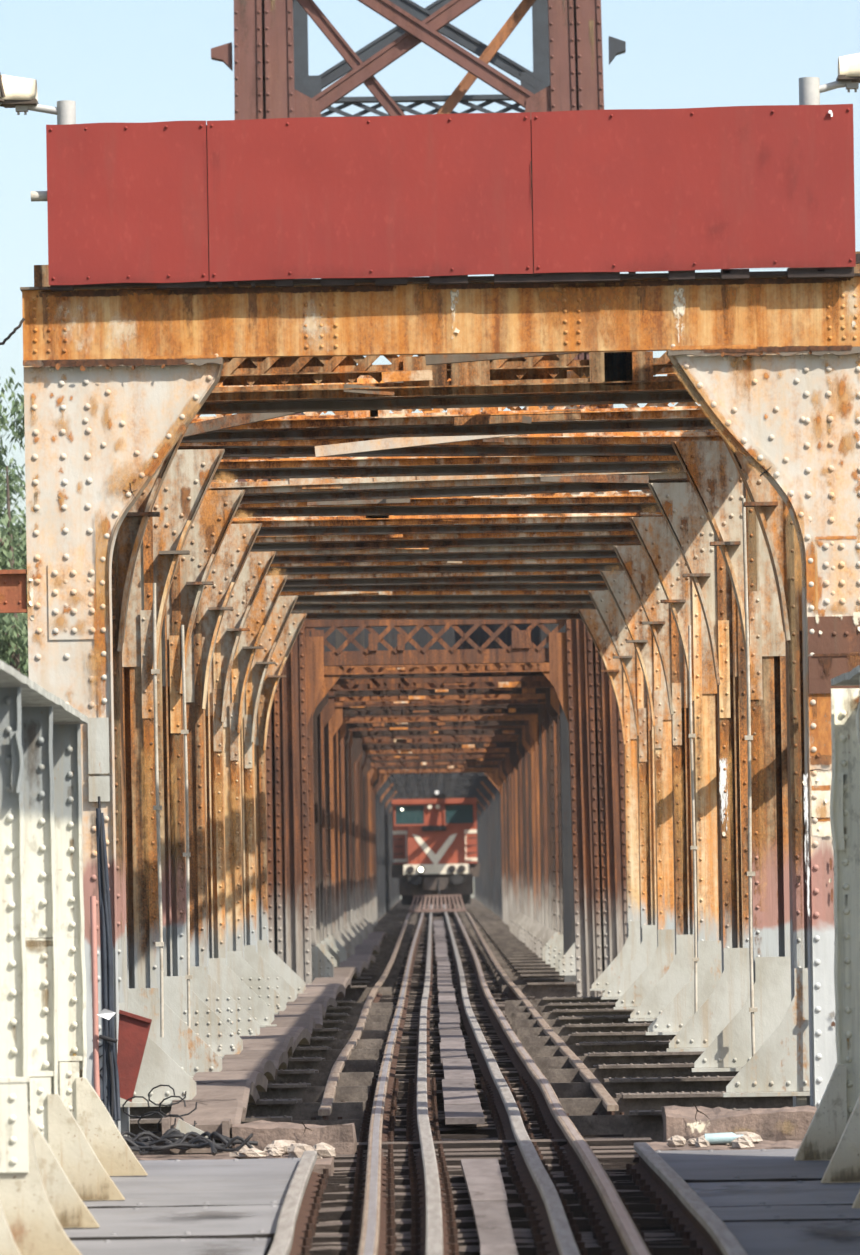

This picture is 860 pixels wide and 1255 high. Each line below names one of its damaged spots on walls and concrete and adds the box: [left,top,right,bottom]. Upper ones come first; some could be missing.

corrosion [30,285,396,344]
corrosion [419,278,851,342]
corrosion [31,355,217,442]
corrosion [110,399,200,495]
corrosion [181,470,233,516]
corrosion [671,344,860,500]
corrosion [784,498,860,617]
corrosion [54,518,111,714]
corrosion [808,693,832,765]
corrosion [143,718,154,858]
corrosion [639,745,682,840]
corrosion [720,721,732,840]